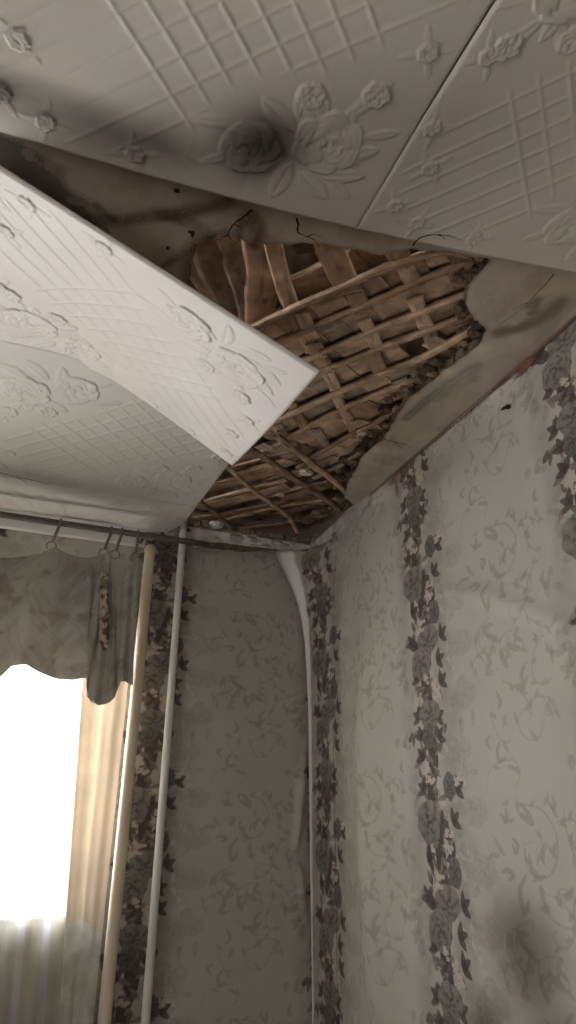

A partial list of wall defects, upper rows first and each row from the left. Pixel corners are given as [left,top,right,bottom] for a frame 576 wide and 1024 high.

damp [90,199,232,224]
crack [296,218,320,246]
crack [412,234,461,246]
peeling [316,527,333,545]